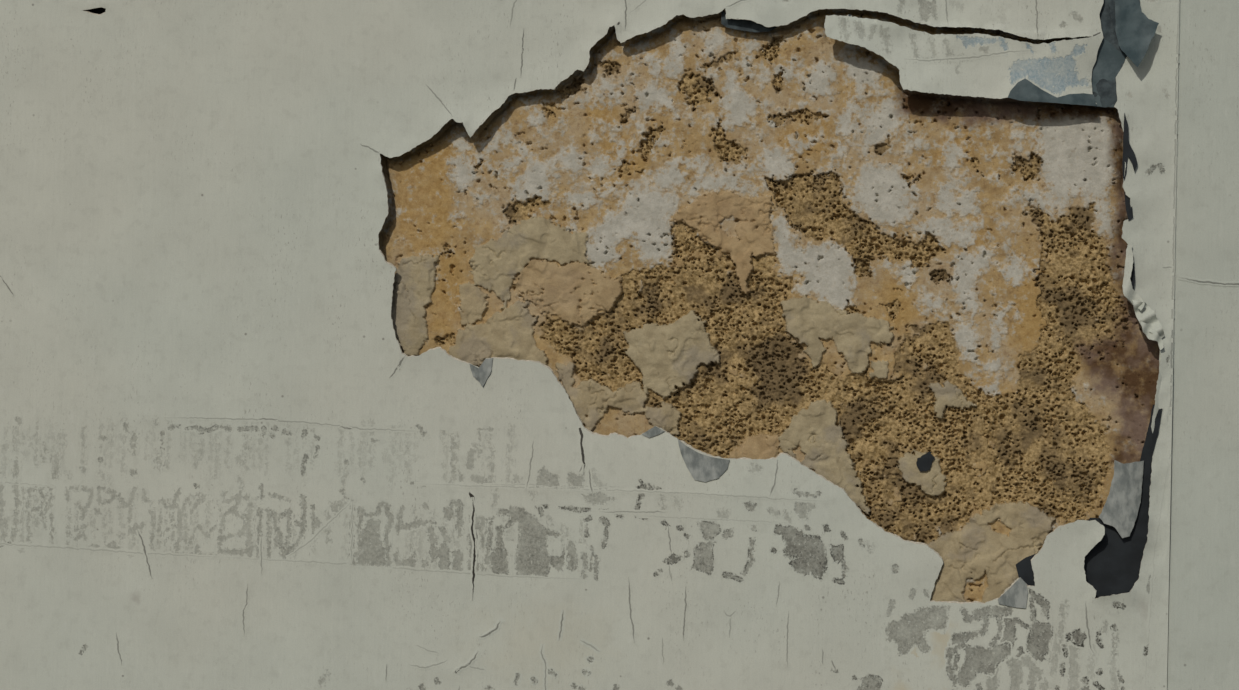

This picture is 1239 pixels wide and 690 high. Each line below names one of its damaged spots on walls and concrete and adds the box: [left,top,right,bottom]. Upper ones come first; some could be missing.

spalling [379,0,1175,690]
crack [467,490,480,601]
crack [384,620,502,690]